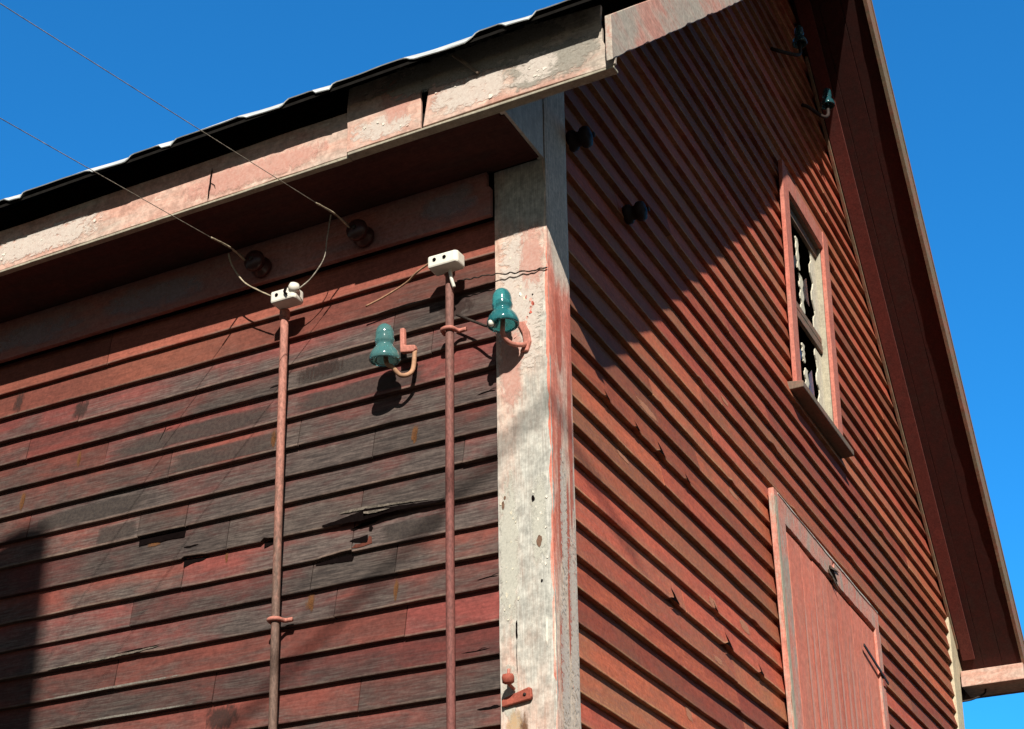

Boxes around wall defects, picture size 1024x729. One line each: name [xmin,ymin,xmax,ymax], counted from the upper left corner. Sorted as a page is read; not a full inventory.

peeling [0,213,102,264]
peeling [499,227,579,729]